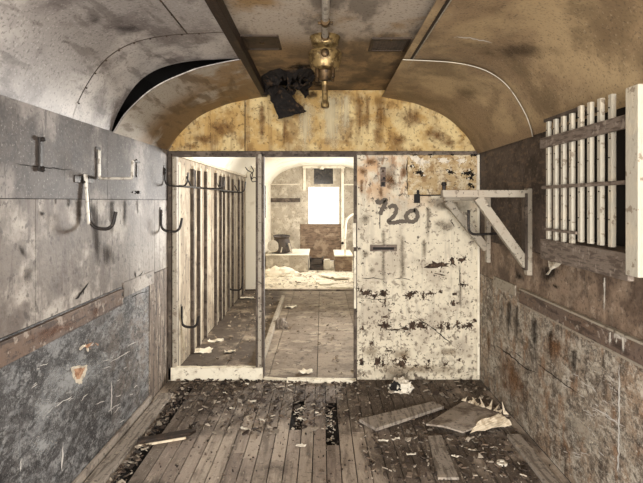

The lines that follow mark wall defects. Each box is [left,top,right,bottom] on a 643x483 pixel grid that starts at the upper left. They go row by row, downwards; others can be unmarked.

peeling [408,154,479,188]
peeling [418,253,469,280]
peeling [357,288,390,307]
peeling [405,289,443,300]
peeling [377,315,477,337]
spalling [71,365,87,384]
peeling [357,347,432,370]
crack [497,346,579,394]